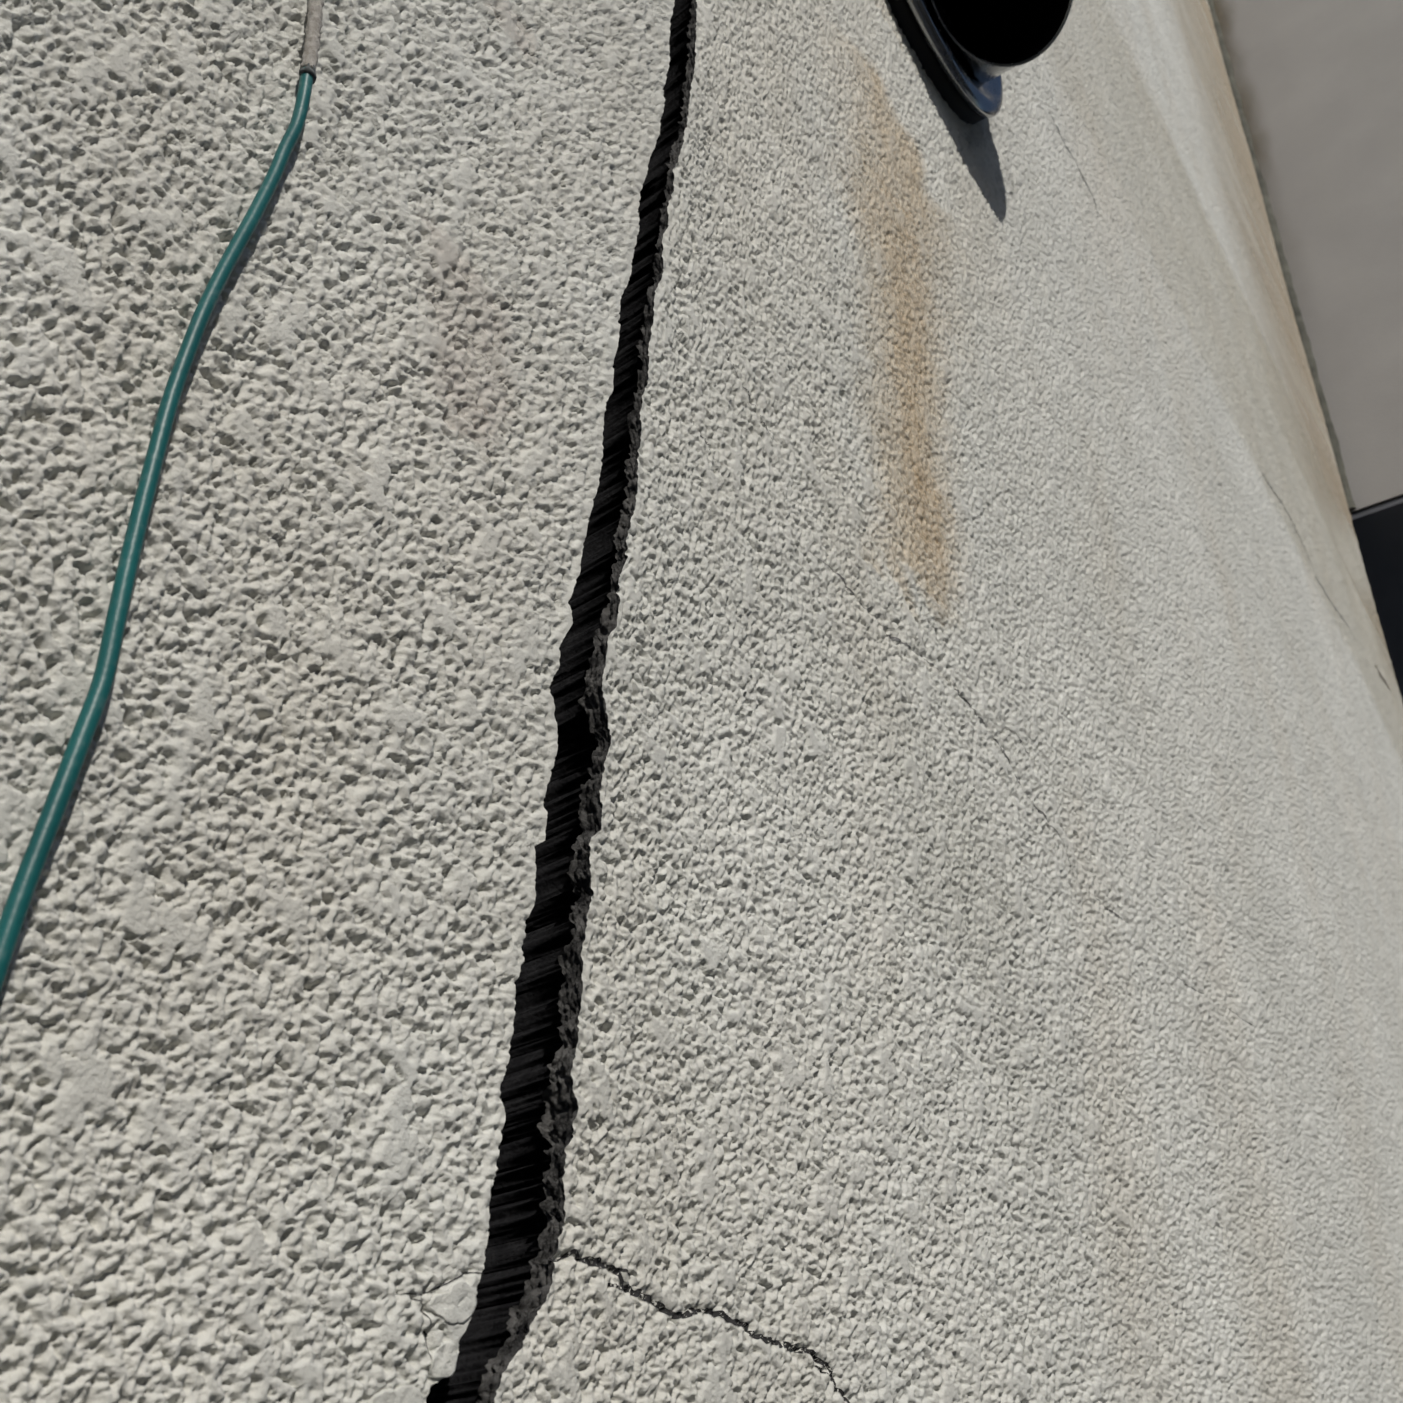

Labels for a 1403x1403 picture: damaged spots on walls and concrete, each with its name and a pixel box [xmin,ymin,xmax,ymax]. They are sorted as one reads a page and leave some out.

crack [402,0,850,1403]